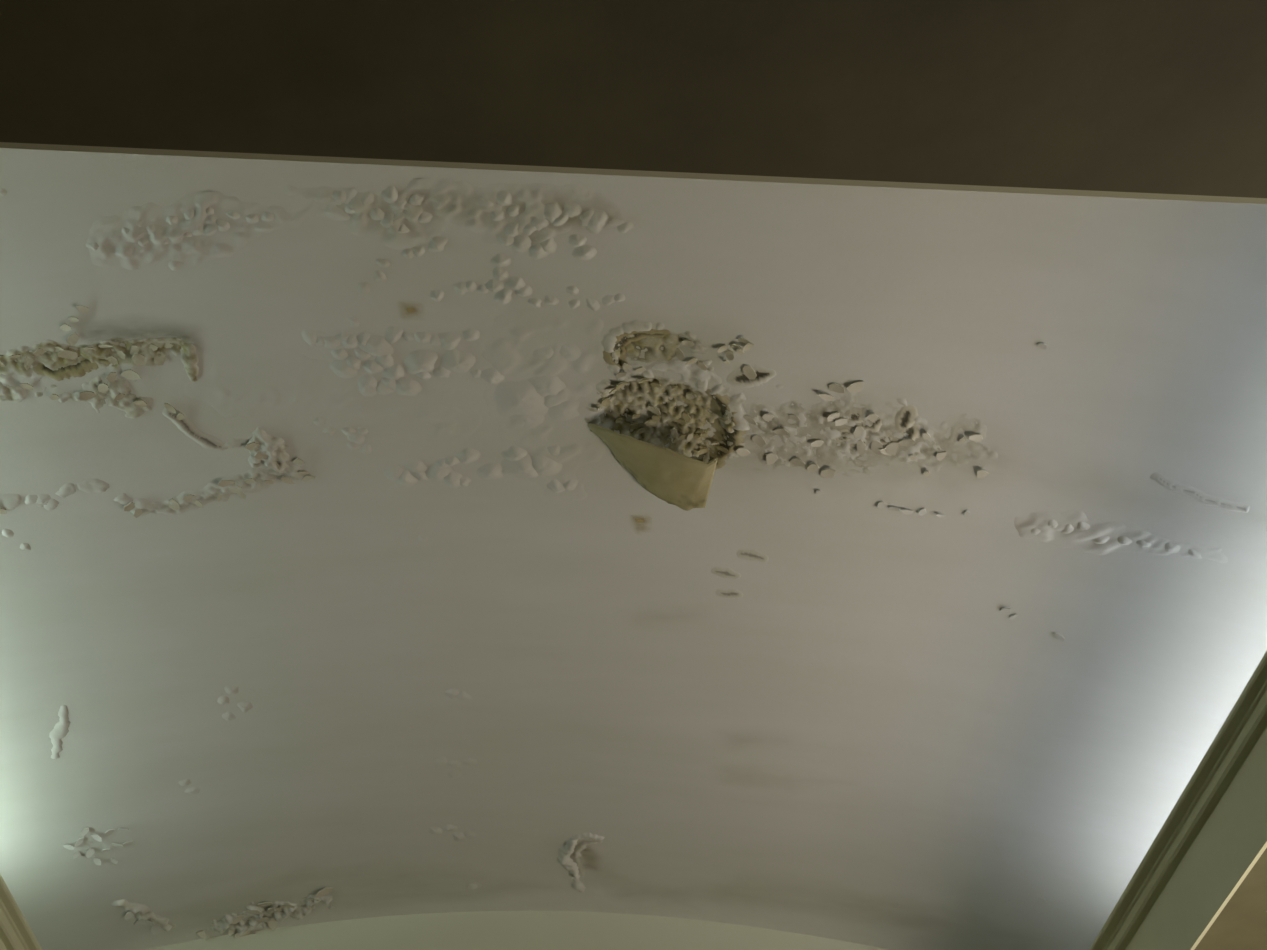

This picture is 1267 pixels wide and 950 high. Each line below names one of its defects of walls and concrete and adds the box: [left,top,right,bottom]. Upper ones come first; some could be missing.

flaking render [0,305,315,518]
peeling [584,319,998,511]